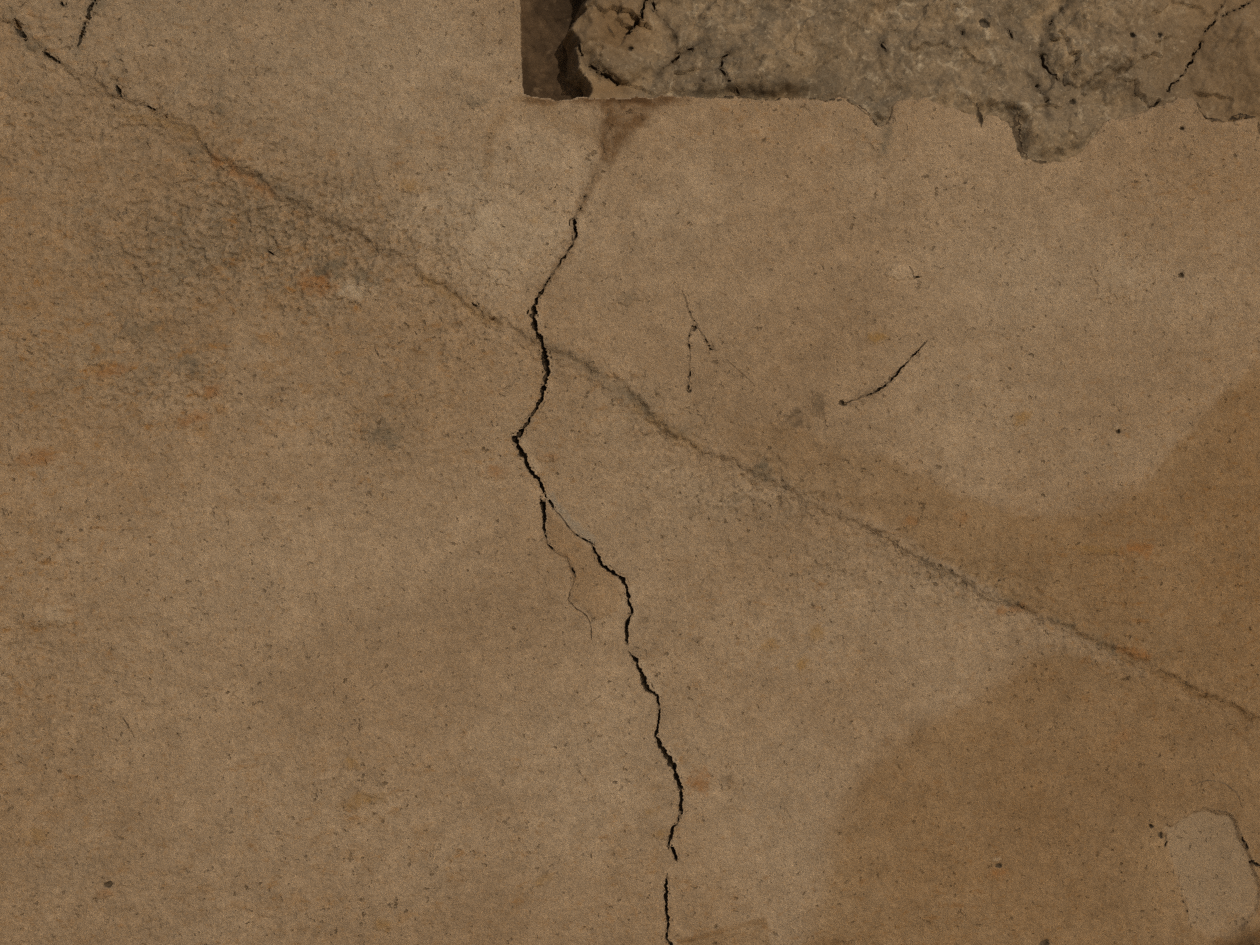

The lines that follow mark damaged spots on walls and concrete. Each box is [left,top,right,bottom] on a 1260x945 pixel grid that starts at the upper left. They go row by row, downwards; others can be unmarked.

flaking render [520,0,1260,164]
crack [844,341,927,404]
crack [510,105,685,945]